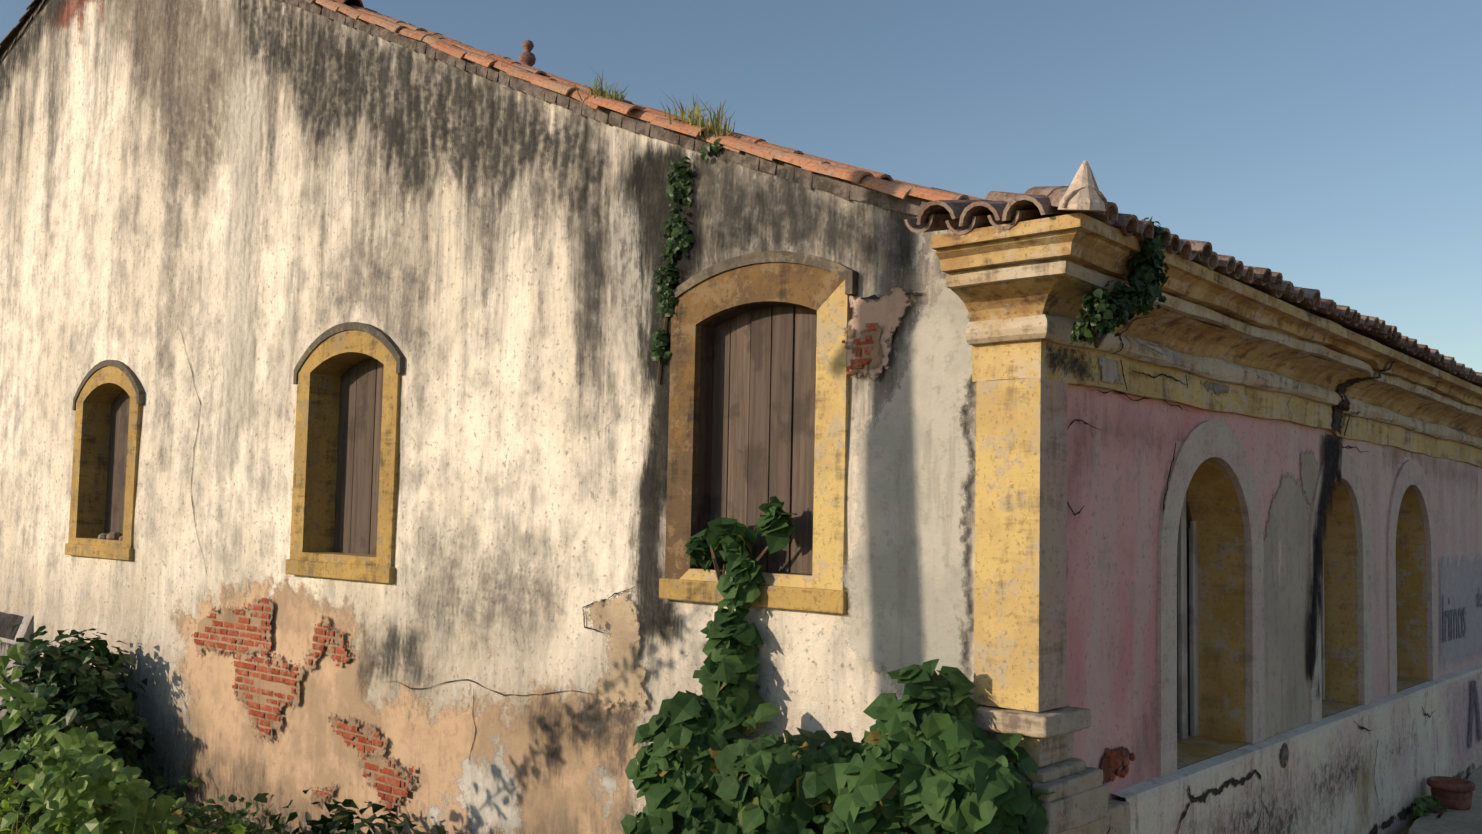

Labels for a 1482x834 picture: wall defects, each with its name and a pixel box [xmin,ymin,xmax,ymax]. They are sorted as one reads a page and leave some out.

rust [54,0,102,43]
water stain [115,0,912,659]
spalling [842,286,925,381]
crack [1332,361,1396,453]
peeling [1263,473,1310,739]
water stain [1307,434,1343,695]
peeling [170,576,652,834]
water stain [524,689,646,776]
spalling [1100,747,1135,784]
crack [1177,769,1270,834]